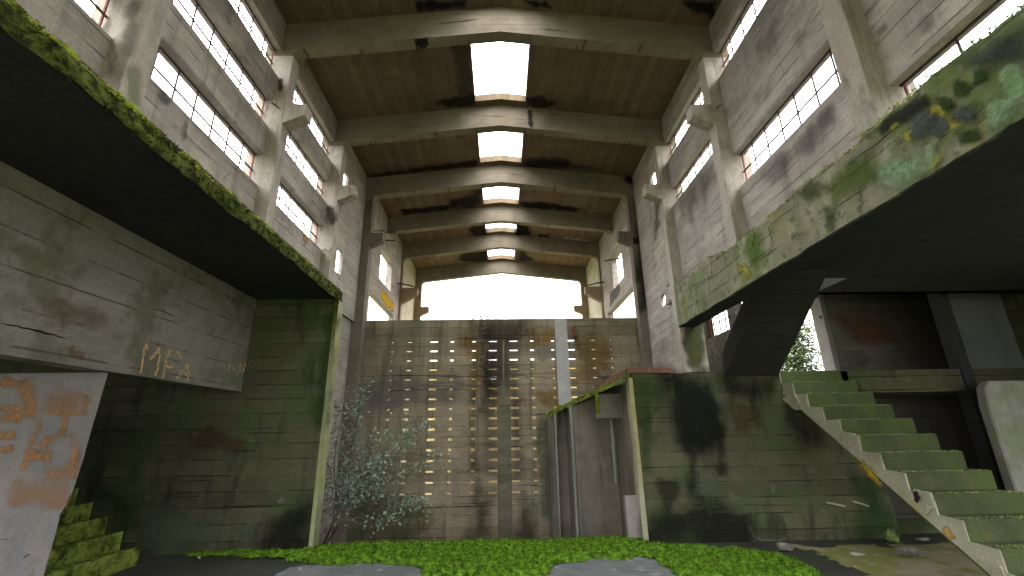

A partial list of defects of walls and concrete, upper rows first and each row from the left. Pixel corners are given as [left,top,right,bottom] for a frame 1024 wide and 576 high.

crack [2,323,66,339]
leakage [476,315,524,392]
leakage [659,369,723,454]